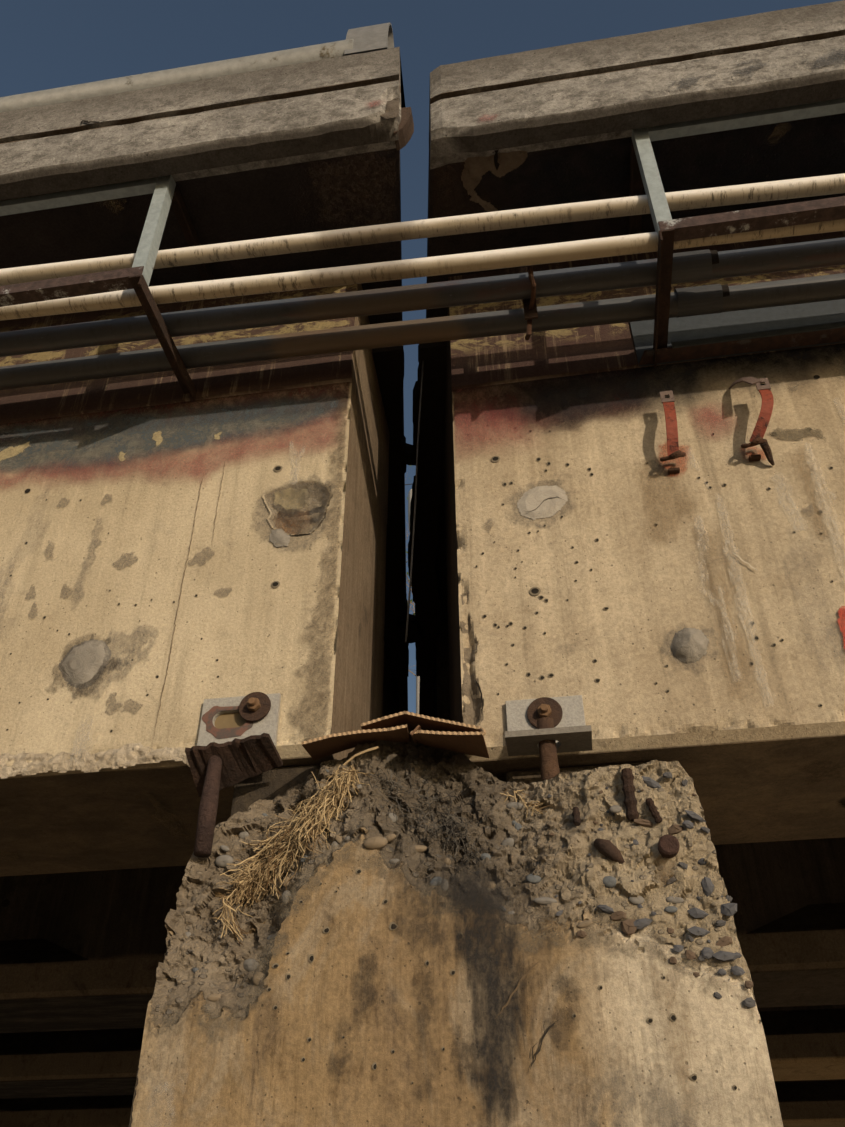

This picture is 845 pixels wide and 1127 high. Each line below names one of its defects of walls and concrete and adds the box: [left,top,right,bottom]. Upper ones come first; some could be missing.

spalling [461,150,528,212]
spalling [258,480,332,547]
rust [572,807,581,826]
rust [621,768,663,824]
rust [594,838,625,864]
spalling [149,740,756,1037]